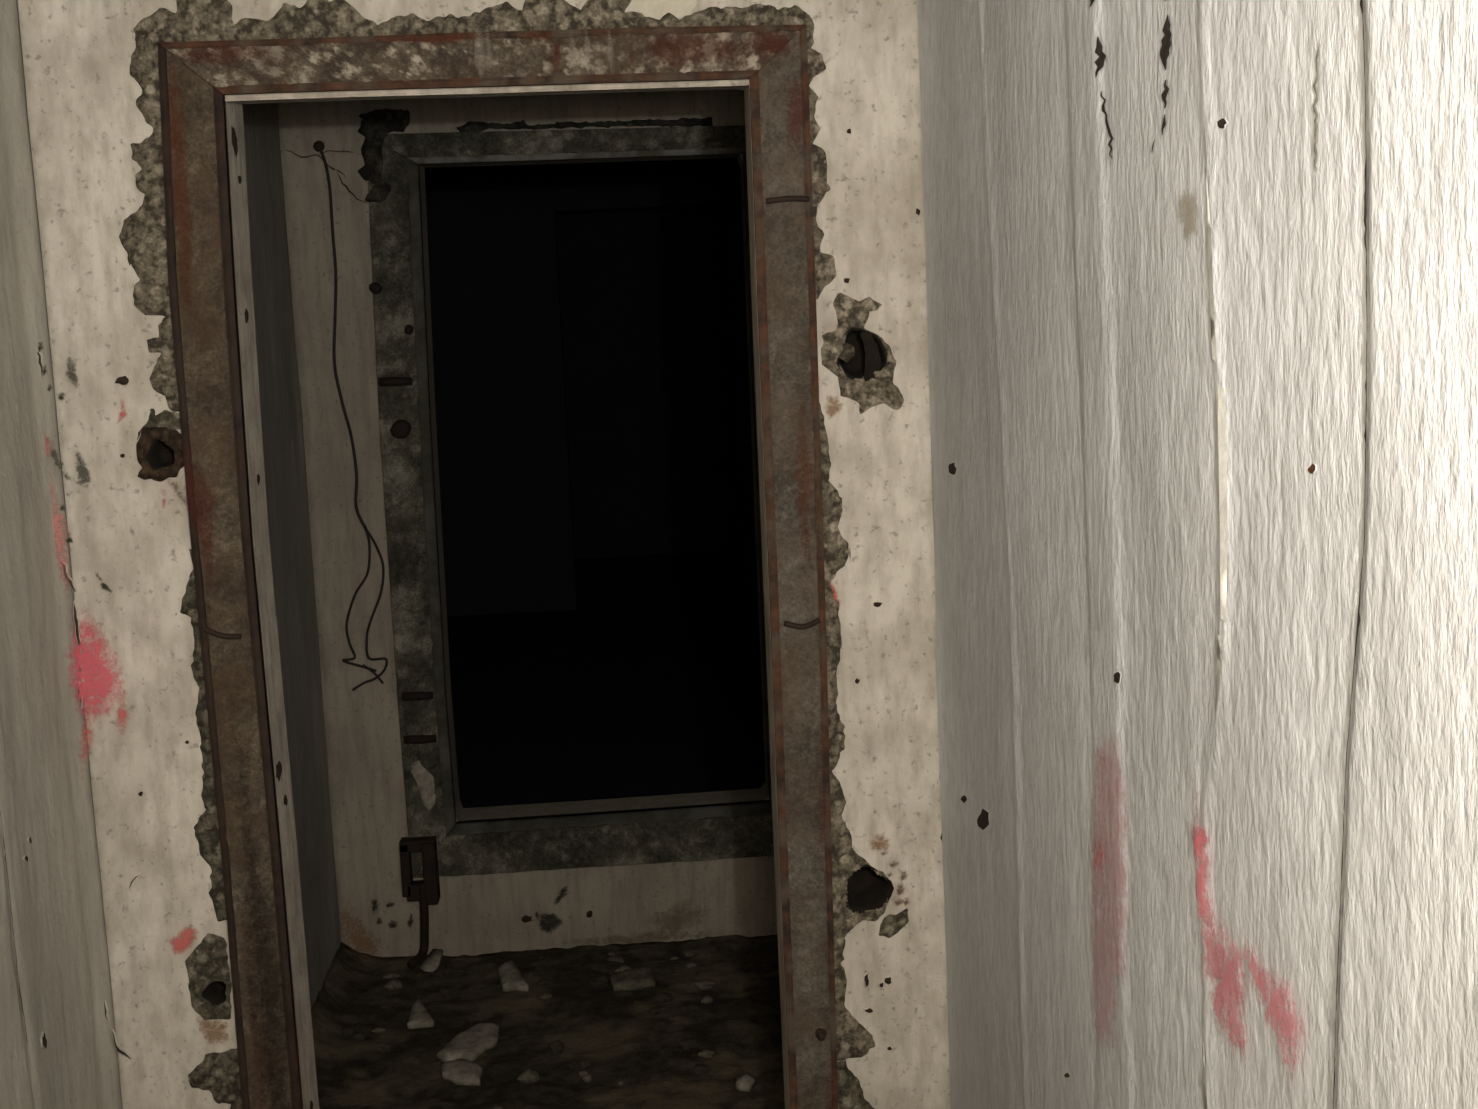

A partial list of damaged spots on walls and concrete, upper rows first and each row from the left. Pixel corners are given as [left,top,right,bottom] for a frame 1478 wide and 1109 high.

flaking render [119,0,904,482]
spalling [114,375,131,386]
flaking render [180,549,232,1020]
spalling [276,761,288,806]
flaking render [819,403,909,1109]
crack [0,813,30,1057]
flaking render [188,1048,242,1109]